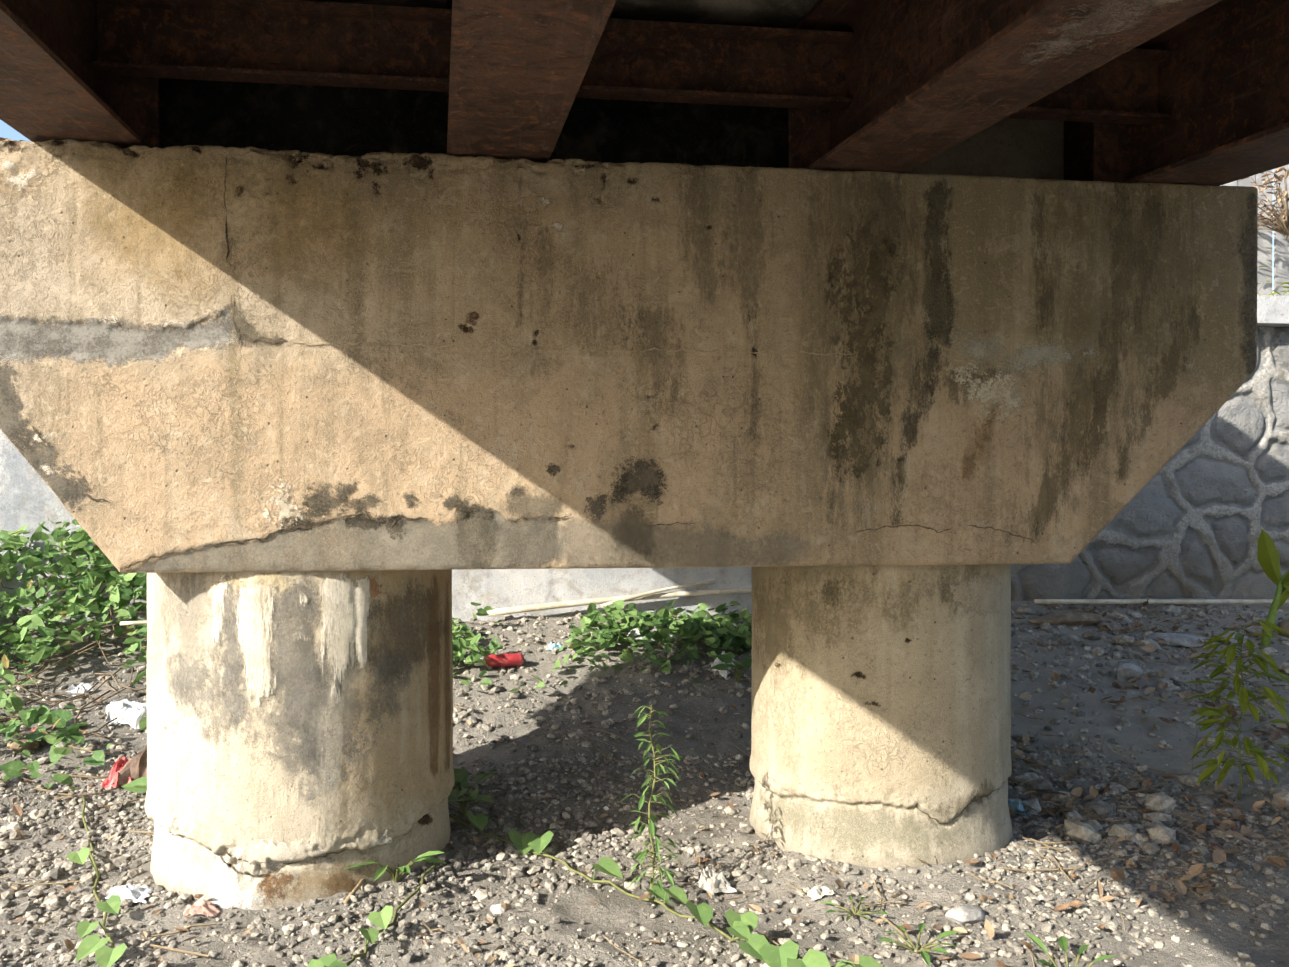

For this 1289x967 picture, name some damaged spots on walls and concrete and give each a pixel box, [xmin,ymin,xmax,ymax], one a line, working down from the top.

water stain [826,172,1161,535]
water stain [260,479,420,542]
water stain [442,486,561,568]
water stain [585,458,666,563]
water stain [210,572,442,789]
crack [862,784,999,824]
crack [154,814,433,877]